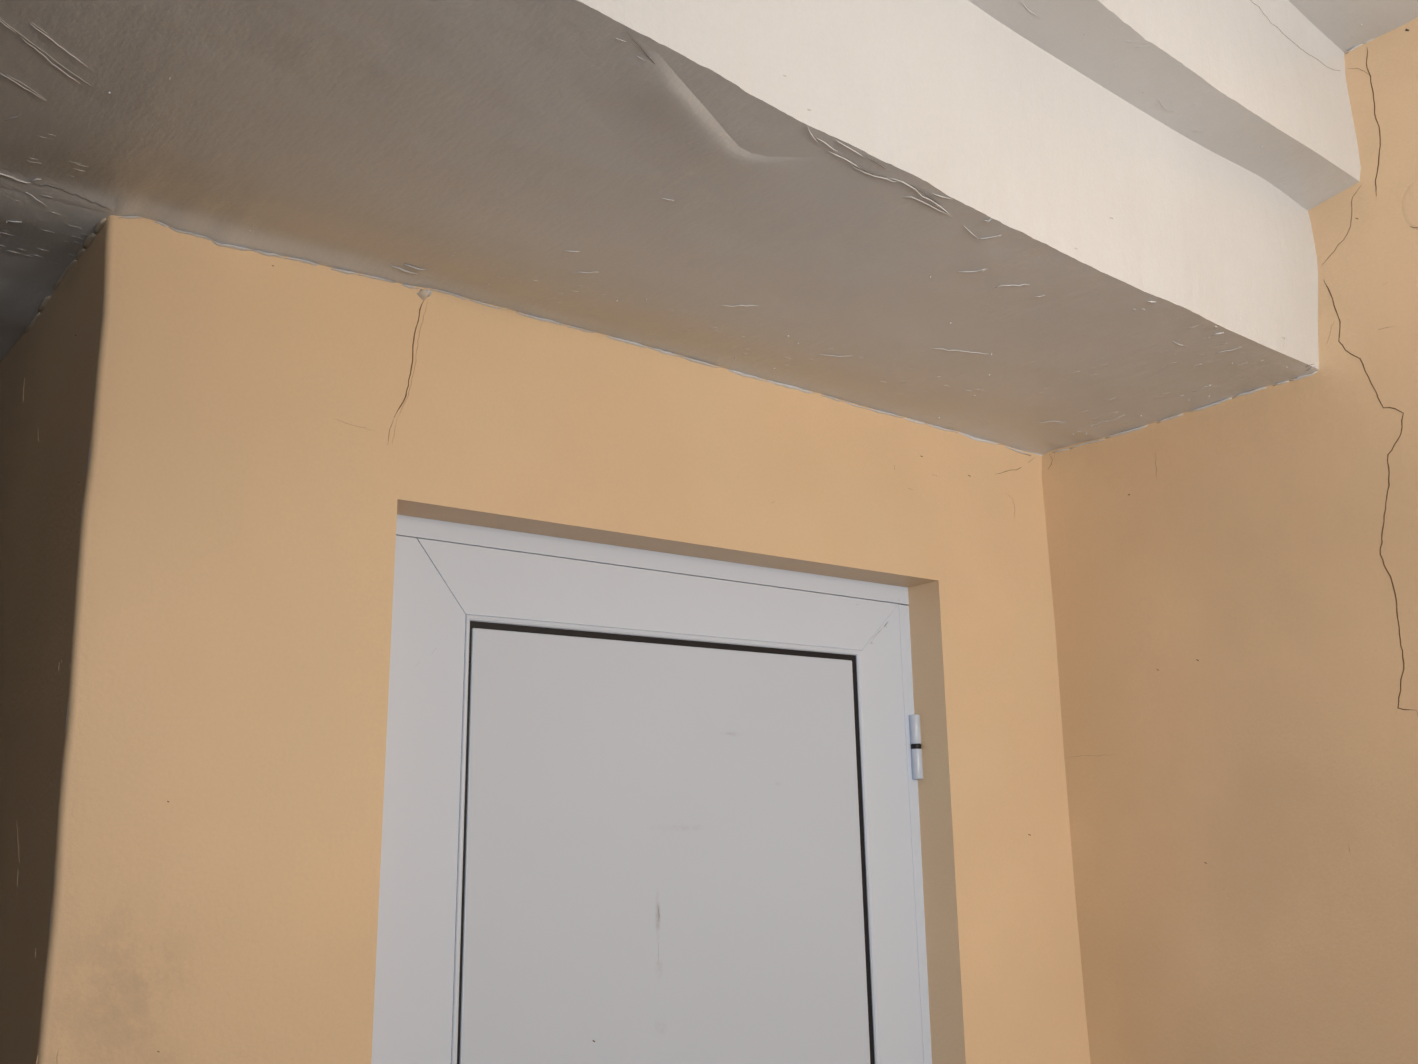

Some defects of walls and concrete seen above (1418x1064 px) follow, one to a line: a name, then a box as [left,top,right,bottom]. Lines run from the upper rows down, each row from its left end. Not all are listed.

crack [339,301,428,443]
crack [1252,2,1418,715]